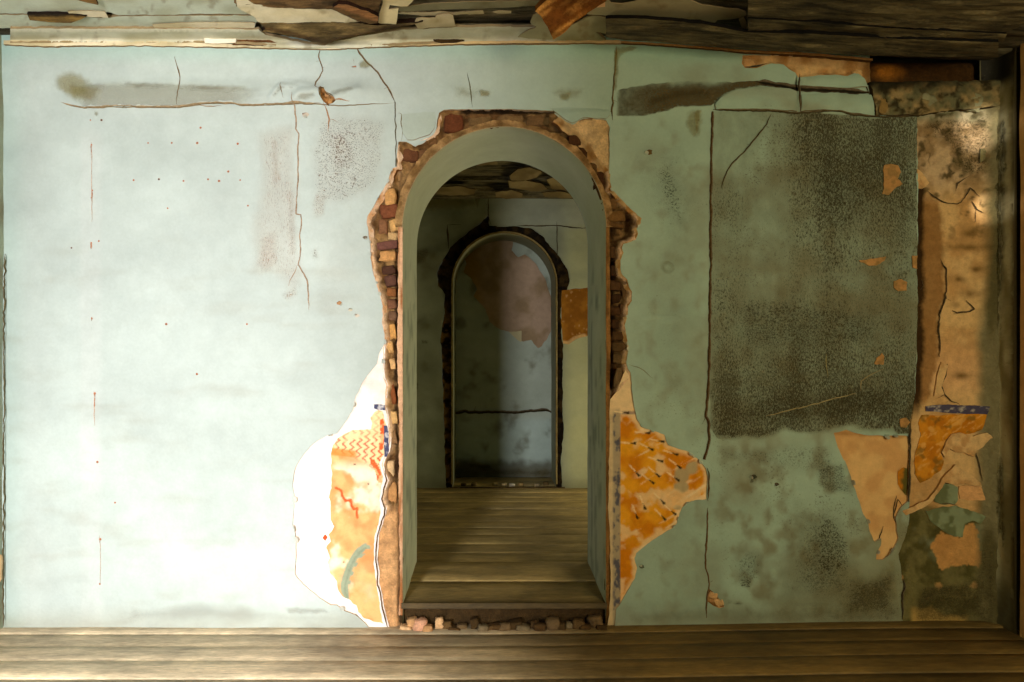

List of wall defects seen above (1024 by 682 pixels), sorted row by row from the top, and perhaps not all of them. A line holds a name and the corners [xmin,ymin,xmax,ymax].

crack [62,51,347,304]
crack [357,49,403,167]
damp [619,81,773,115]
spalling [742,55,1001,117]
crack [928,176,984,221]
flaking render [292,109,707,627]
crack [703,63,917,620]
damp [710,112,1006,438]
crack [920,259,975,405]
peeling [834,418,910,559]